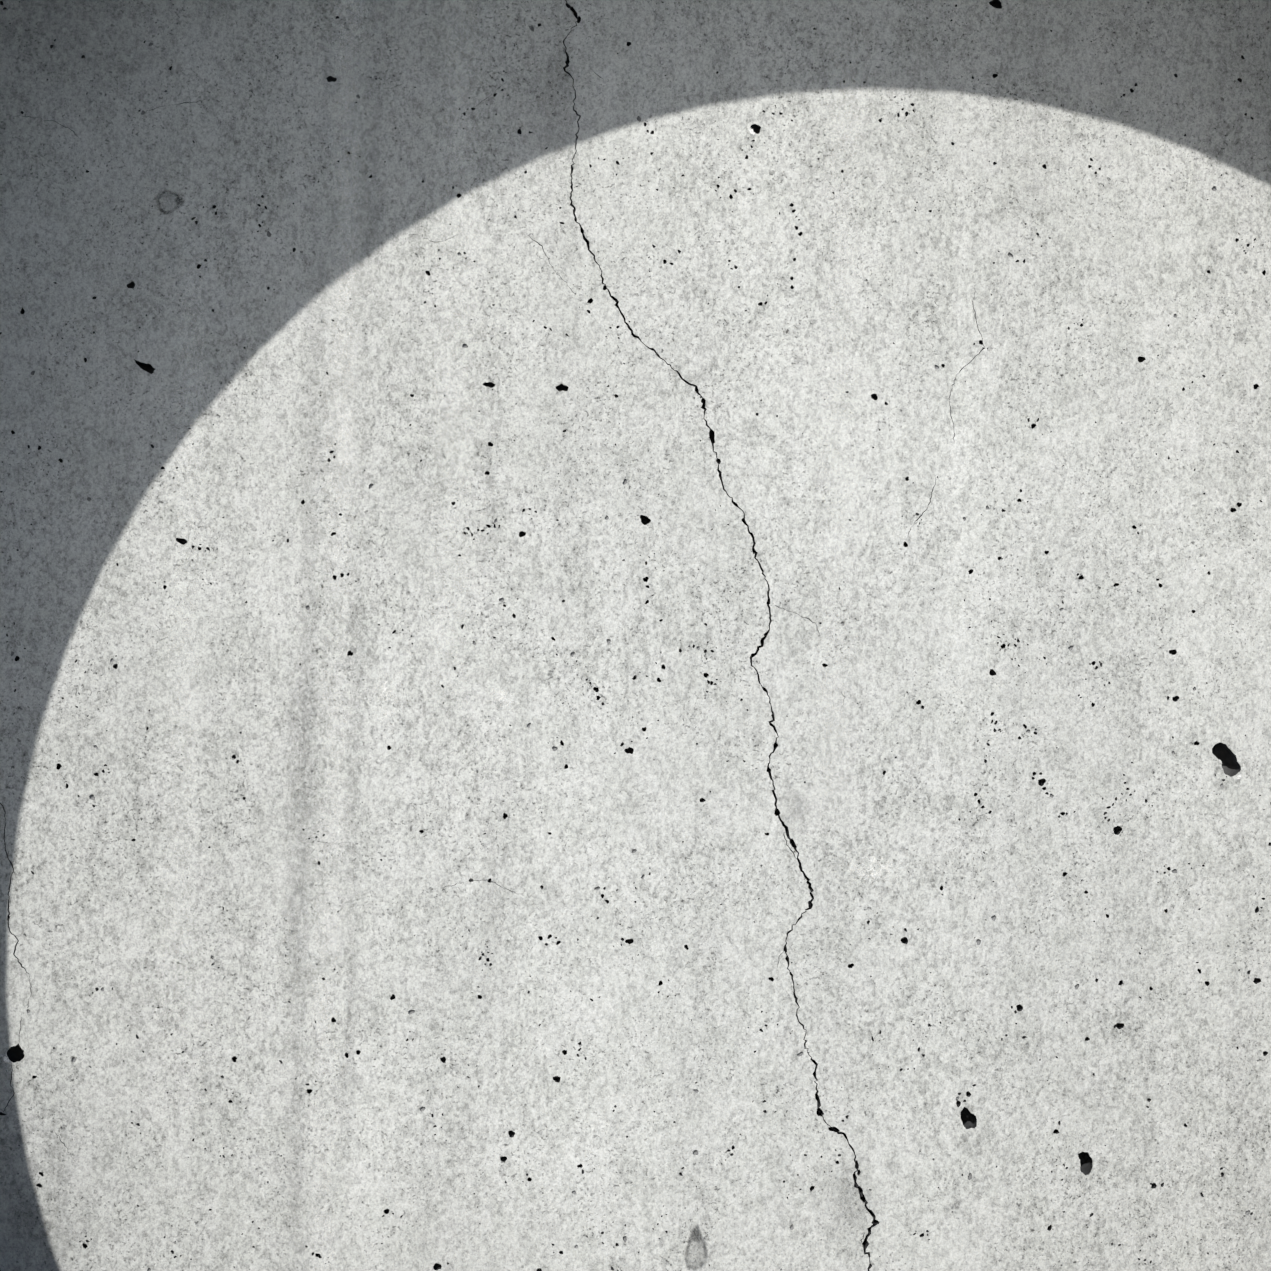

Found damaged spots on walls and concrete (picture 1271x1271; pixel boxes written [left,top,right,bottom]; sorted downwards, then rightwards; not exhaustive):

crack [563,0,880,1271]